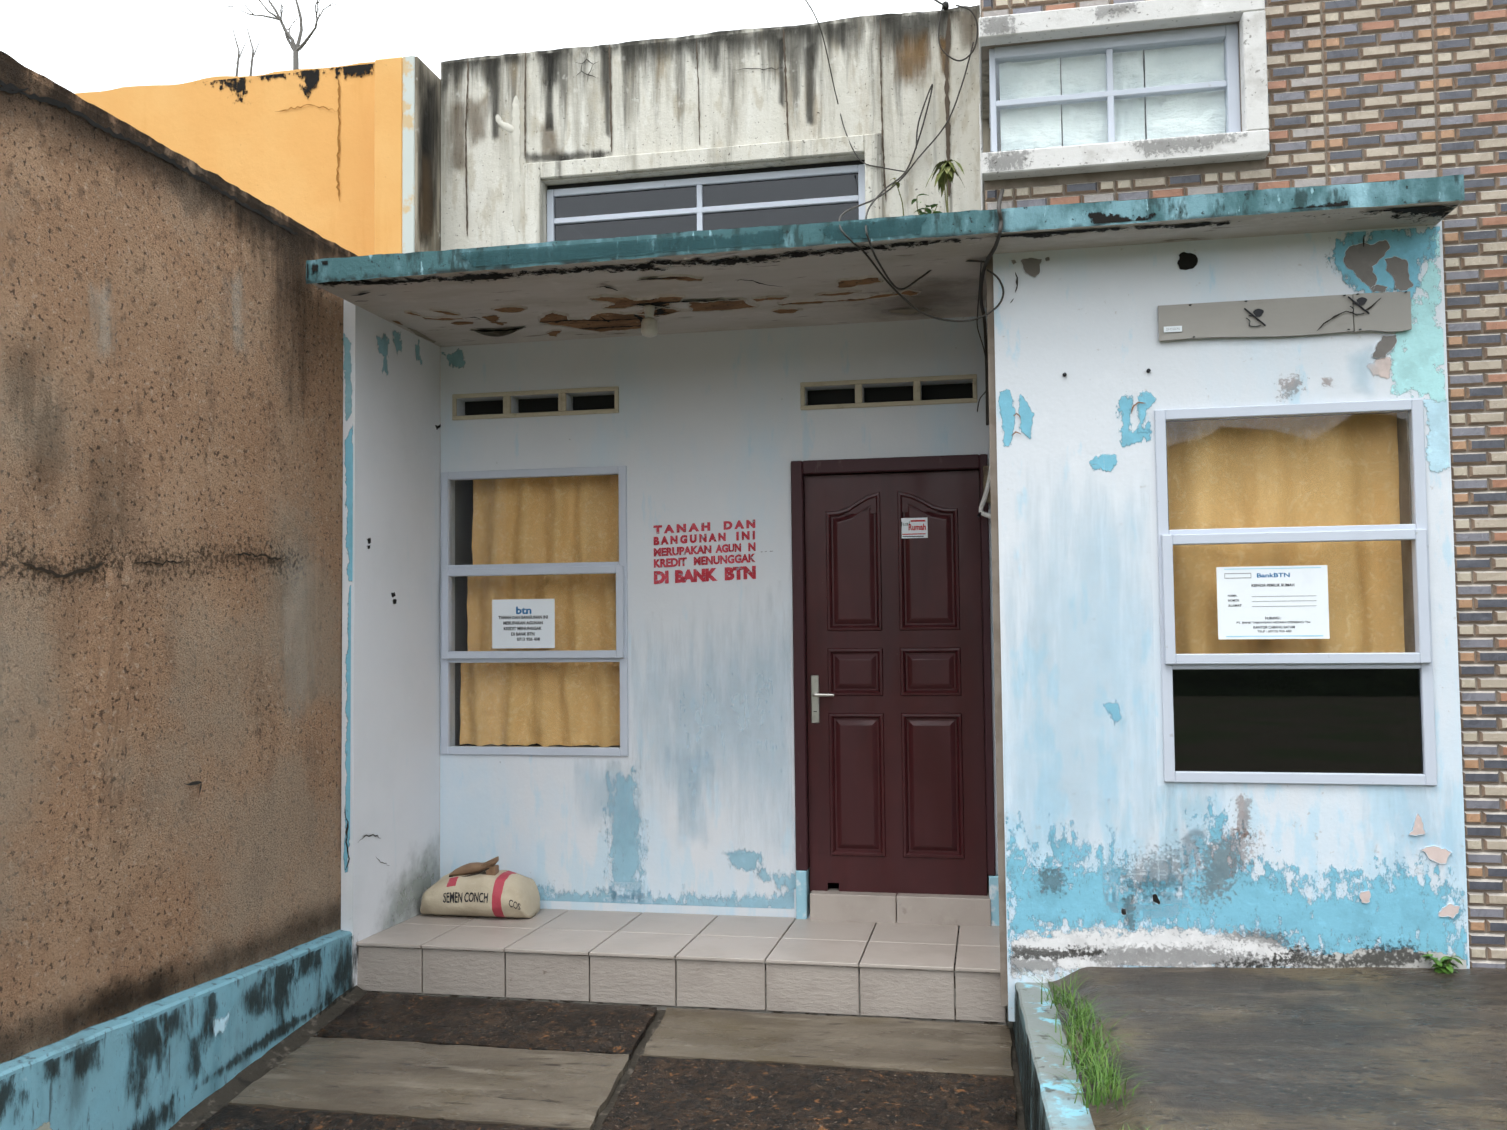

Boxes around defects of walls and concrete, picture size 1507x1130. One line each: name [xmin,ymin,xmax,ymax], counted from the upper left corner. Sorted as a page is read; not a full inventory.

damp [203,63,375,103]
damp [544,52,558,129]
damp [603,29,784,134]
damp [418,56,516,239]
flaking render [451,274,922,337]
damp [236,201,1240,334]
peeling [1328,226,1450,473]
peeling [998,389,1034,446]
peeling [1089,391,1156,472]
crack [0,520,306,619]
peeling [1006,798,1468,979]
damp [127,910,359,1130]